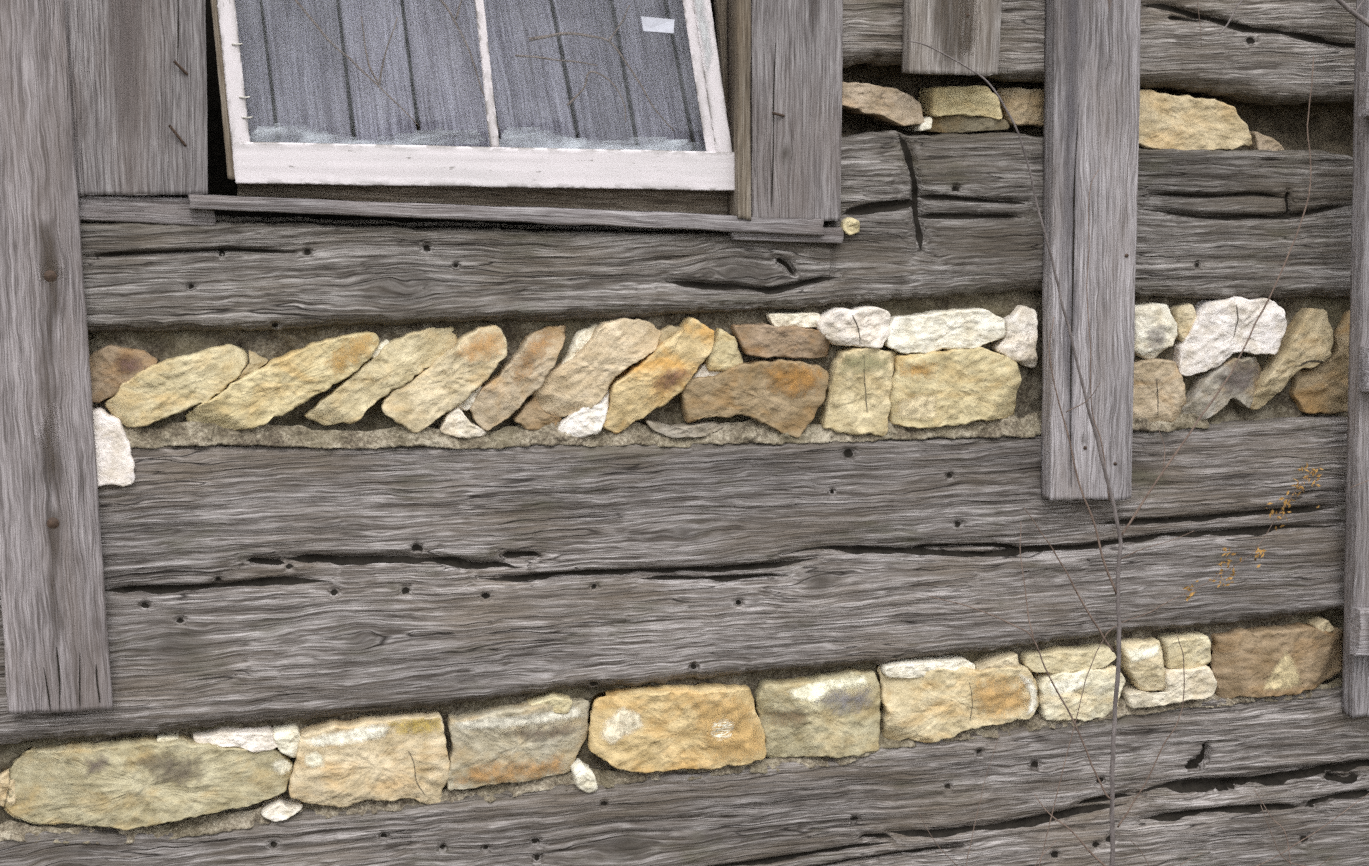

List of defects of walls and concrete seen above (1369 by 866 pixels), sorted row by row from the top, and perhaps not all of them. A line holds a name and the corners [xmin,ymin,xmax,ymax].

crack [43,647,100,712]